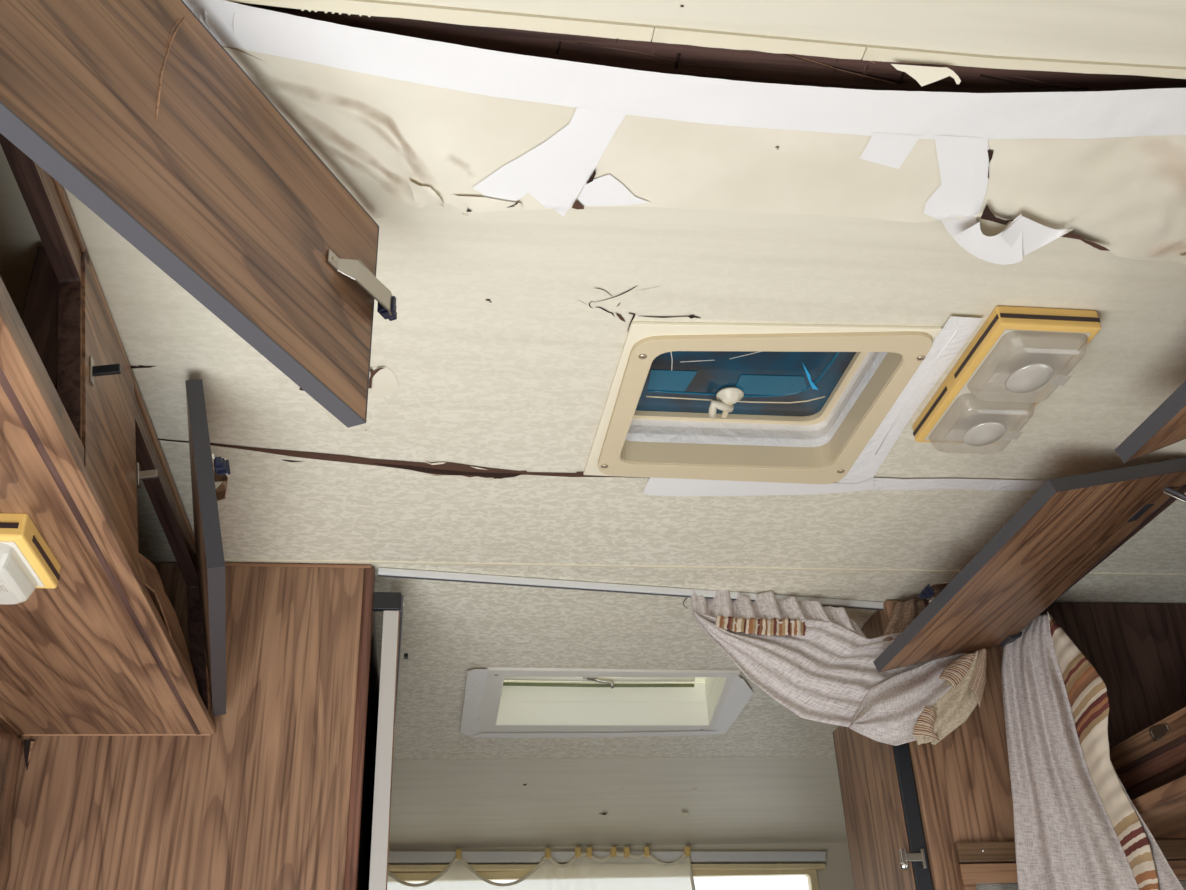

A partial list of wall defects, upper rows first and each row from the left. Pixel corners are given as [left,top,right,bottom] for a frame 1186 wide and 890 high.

peeling [891,64,961,86]
crack [578,286,699,332]
crack [158,439,646,482]